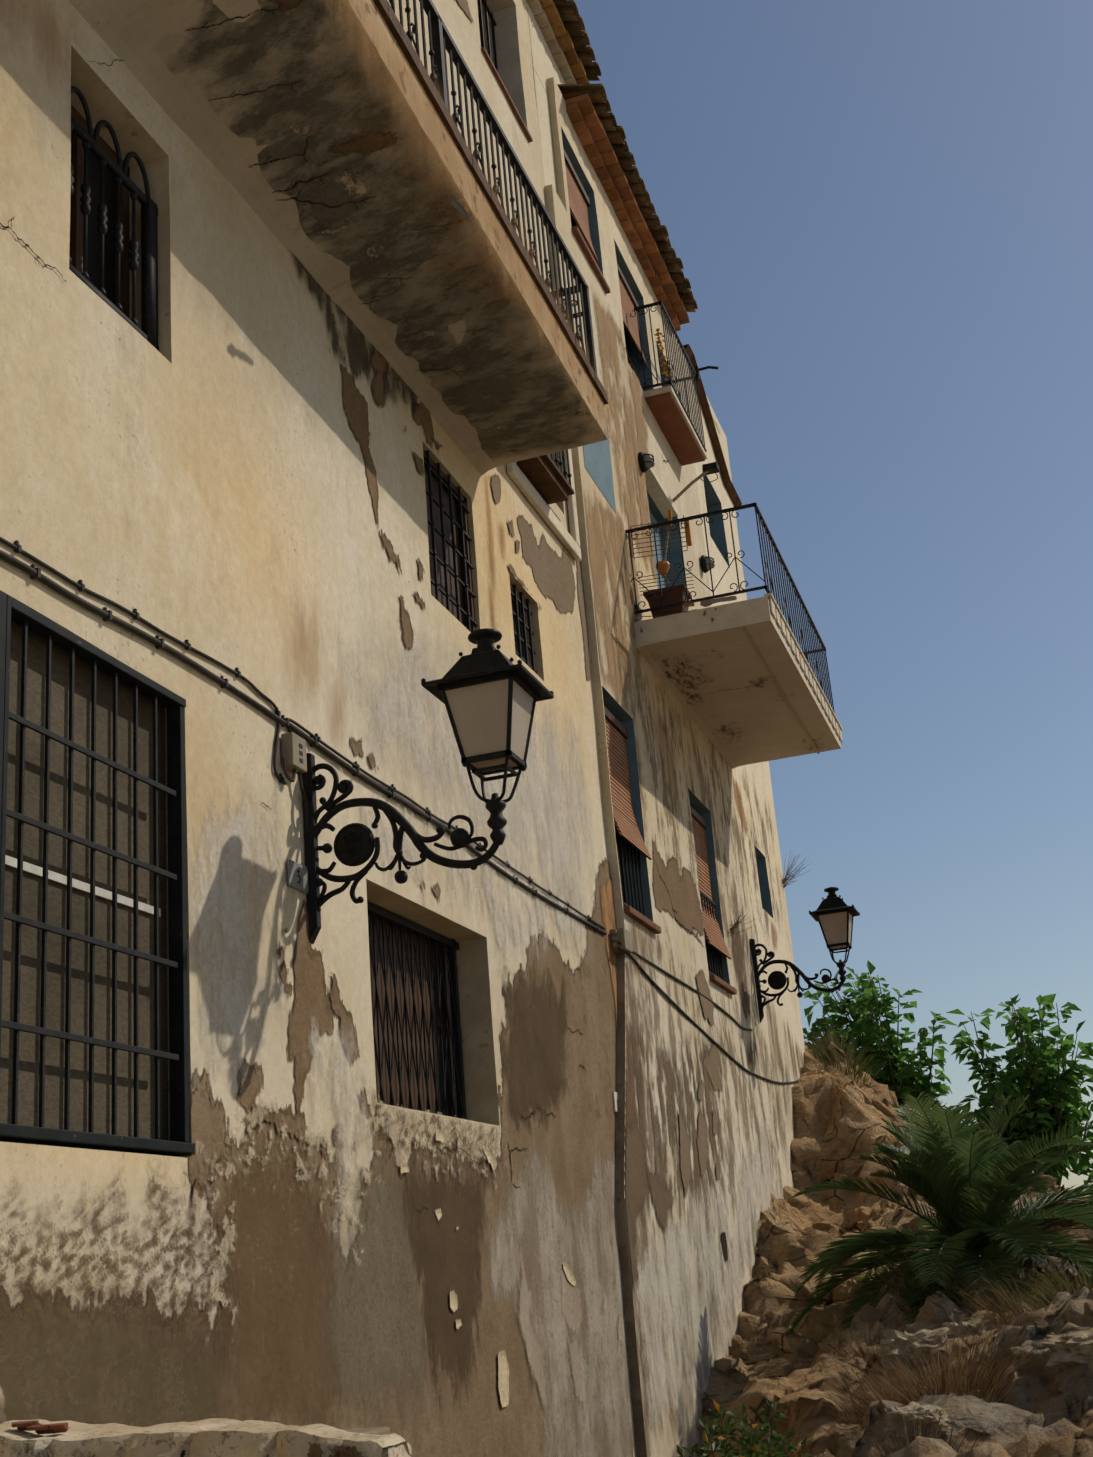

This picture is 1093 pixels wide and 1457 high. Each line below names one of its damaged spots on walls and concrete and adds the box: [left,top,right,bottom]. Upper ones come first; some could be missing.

crack [0,216,67,282]
leakage [188,0,590,457]
flaking render [329,348,426,650]
flaking render [405,401,444,477]
flaking render [491,473,501,504]
flaking render [508,298,661,709]
flaking render [683,596,737,621]
flaking render [653,840,704,936]
flaking render [0,856,726,1457]
leakage [0,648,789,1457]